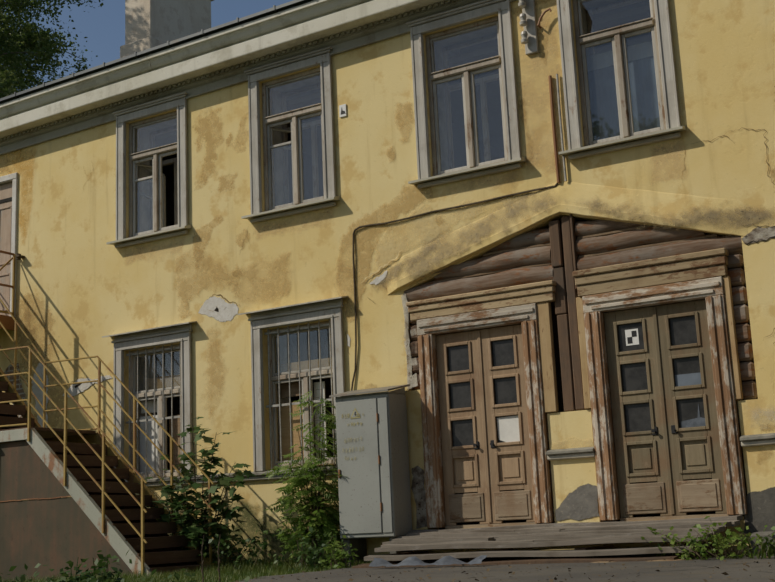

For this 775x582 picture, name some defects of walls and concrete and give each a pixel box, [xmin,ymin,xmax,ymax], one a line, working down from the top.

flaking render [741,224,775,245]
flaking render [198,294,240,322]
flaking render [62,375,112,397]